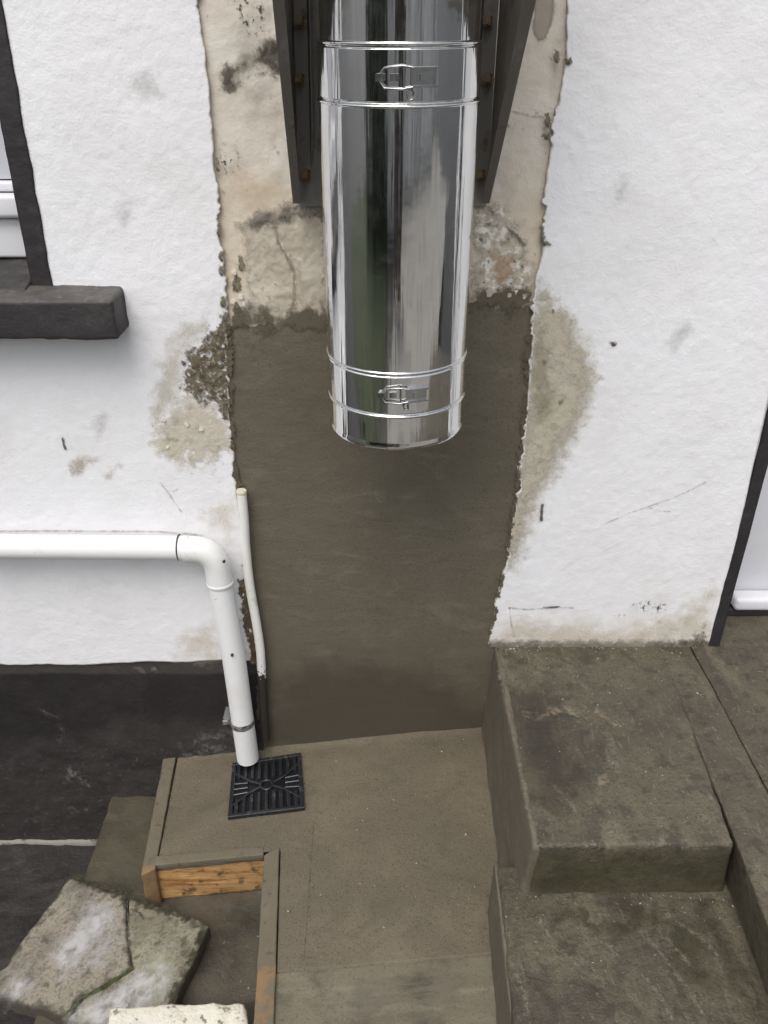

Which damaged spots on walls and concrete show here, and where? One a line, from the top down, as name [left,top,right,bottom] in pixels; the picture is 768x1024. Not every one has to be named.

flaking render [155,0,326,467]
flaking render [469,0,596,567]